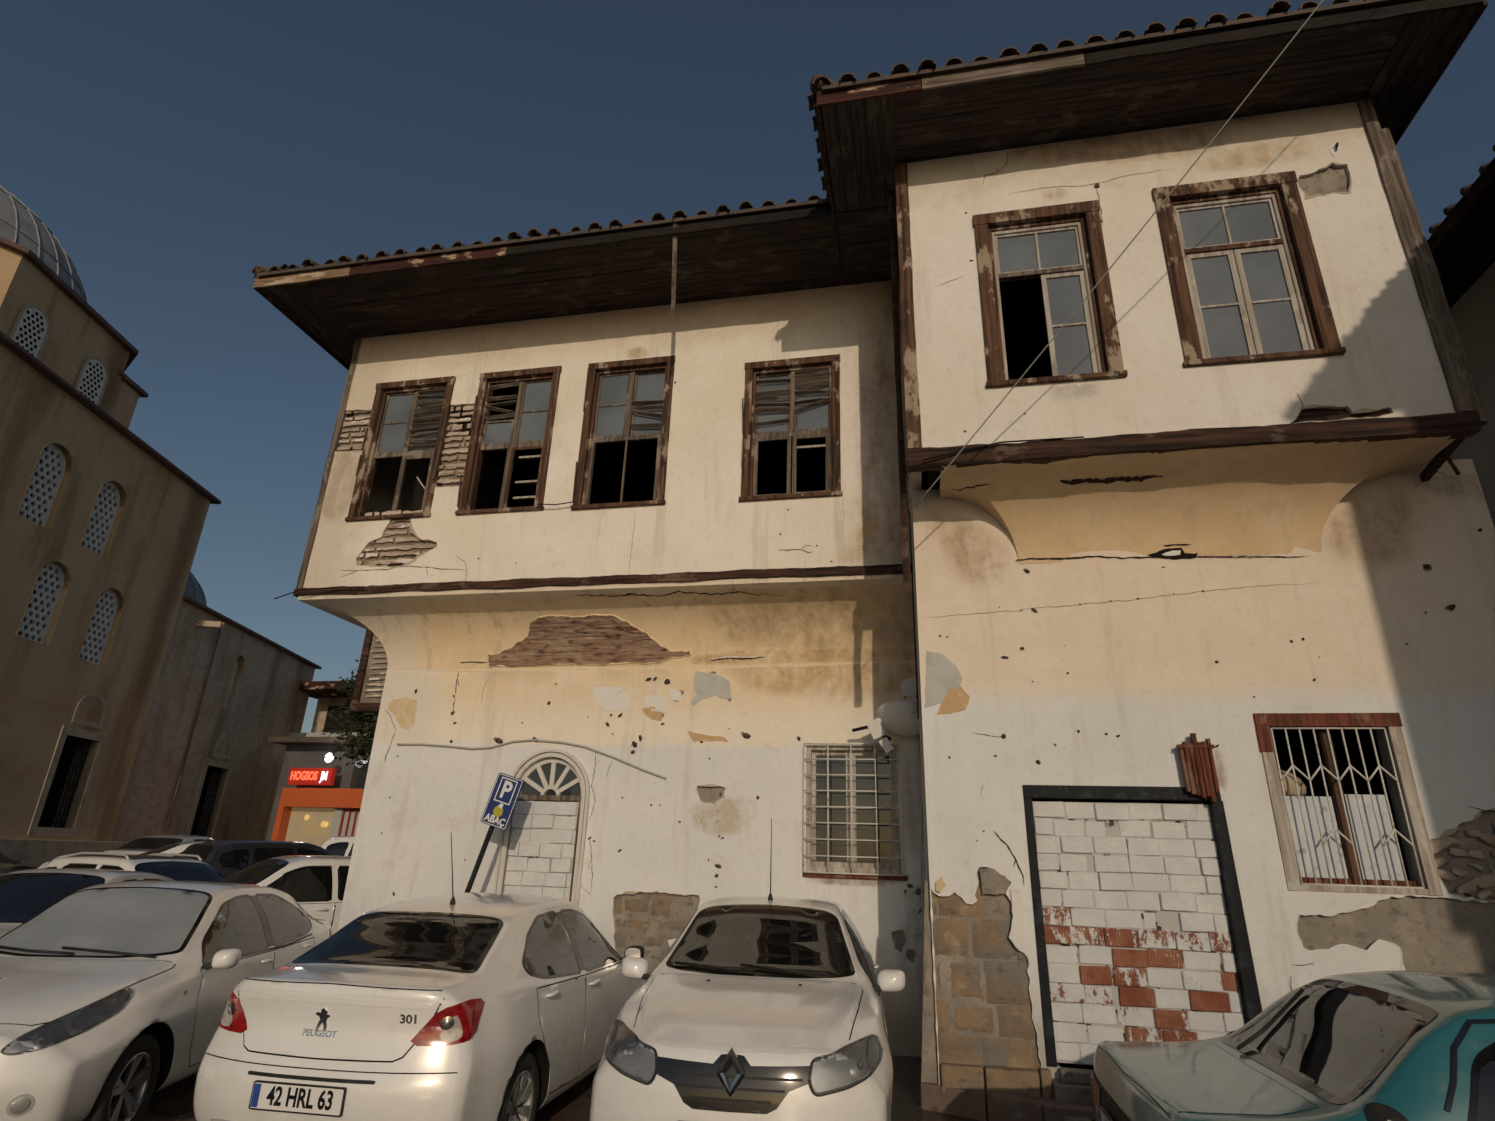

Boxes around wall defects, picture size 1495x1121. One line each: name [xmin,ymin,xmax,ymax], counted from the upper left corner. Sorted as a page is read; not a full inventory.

flaking render [1298,142,1353,199]
crack [1060,475,1163,485]
crack [943,544,1310,617]
peeling [592,677,684,735]
peeling [937,686,970,714]
flaking render [613,859,721,974]
flaking render [1297,808,1495,973]
flaking render [891,865,1042,1086]